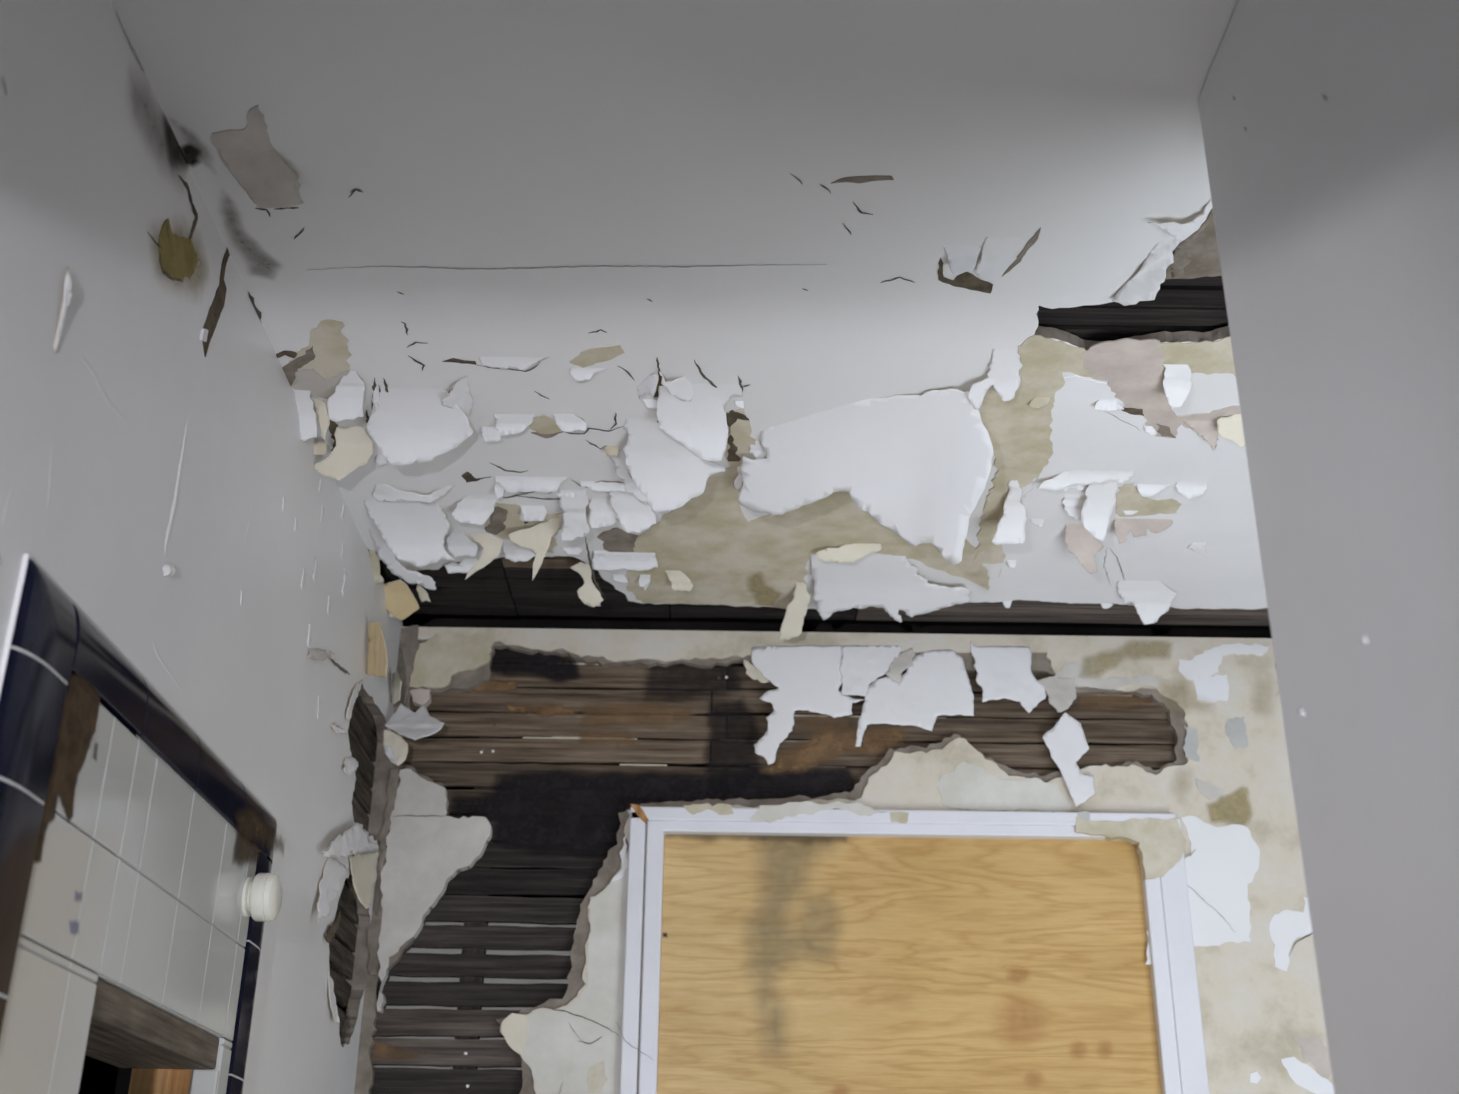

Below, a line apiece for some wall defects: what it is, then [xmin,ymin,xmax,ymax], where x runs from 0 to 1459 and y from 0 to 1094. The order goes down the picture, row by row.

water stain [140,102,199,166]
peeling [197,105,304,216]
peeling [227,210,275,274]
peeling [1171,208,1213,278]
water stain [451,648,904,856]
flaking render [276,319,1272,1094]